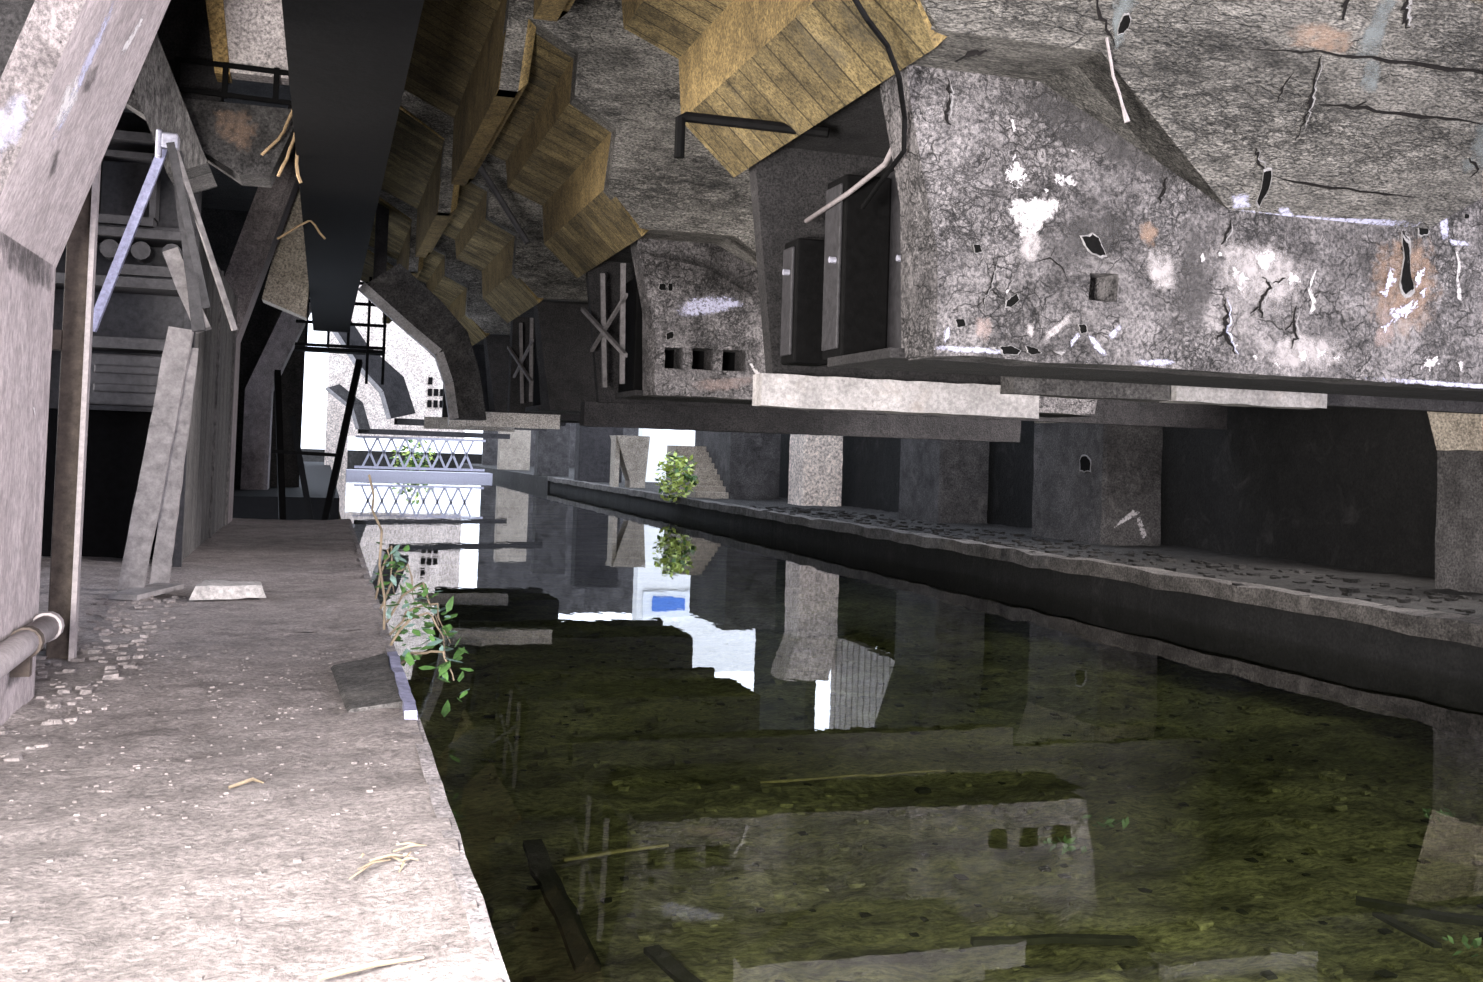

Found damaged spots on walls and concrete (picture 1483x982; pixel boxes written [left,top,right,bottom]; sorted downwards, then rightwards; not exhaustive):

crack [1096,0,1115,46]
crack [1257,0,1483,177]
peeling [1005,154,1029,189]
peeling [1045,174,1076,193]
crack [1254,148,1417,255]
spalling [1079,233,1107,259]
crack [1217,277,1300,354]
spalling [1380,228,1429,332]